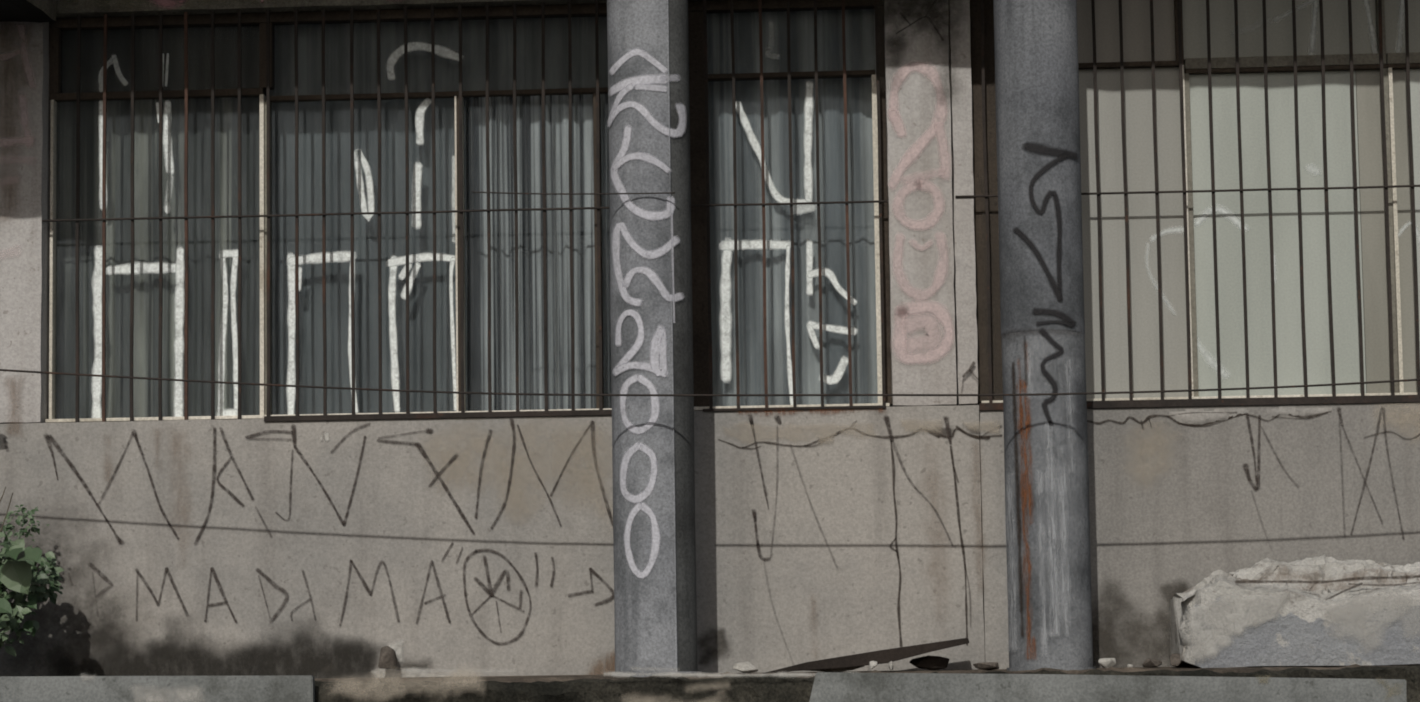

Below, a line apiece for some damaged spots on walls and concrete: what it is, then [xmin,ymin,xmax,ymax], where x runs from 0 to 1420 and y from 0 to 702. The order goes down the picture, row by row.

leakage [21,602,376,679]
crack [718,426,1002,647]
corrosion [1018,380,1035,659]
peeling [1190,594,1287,656]